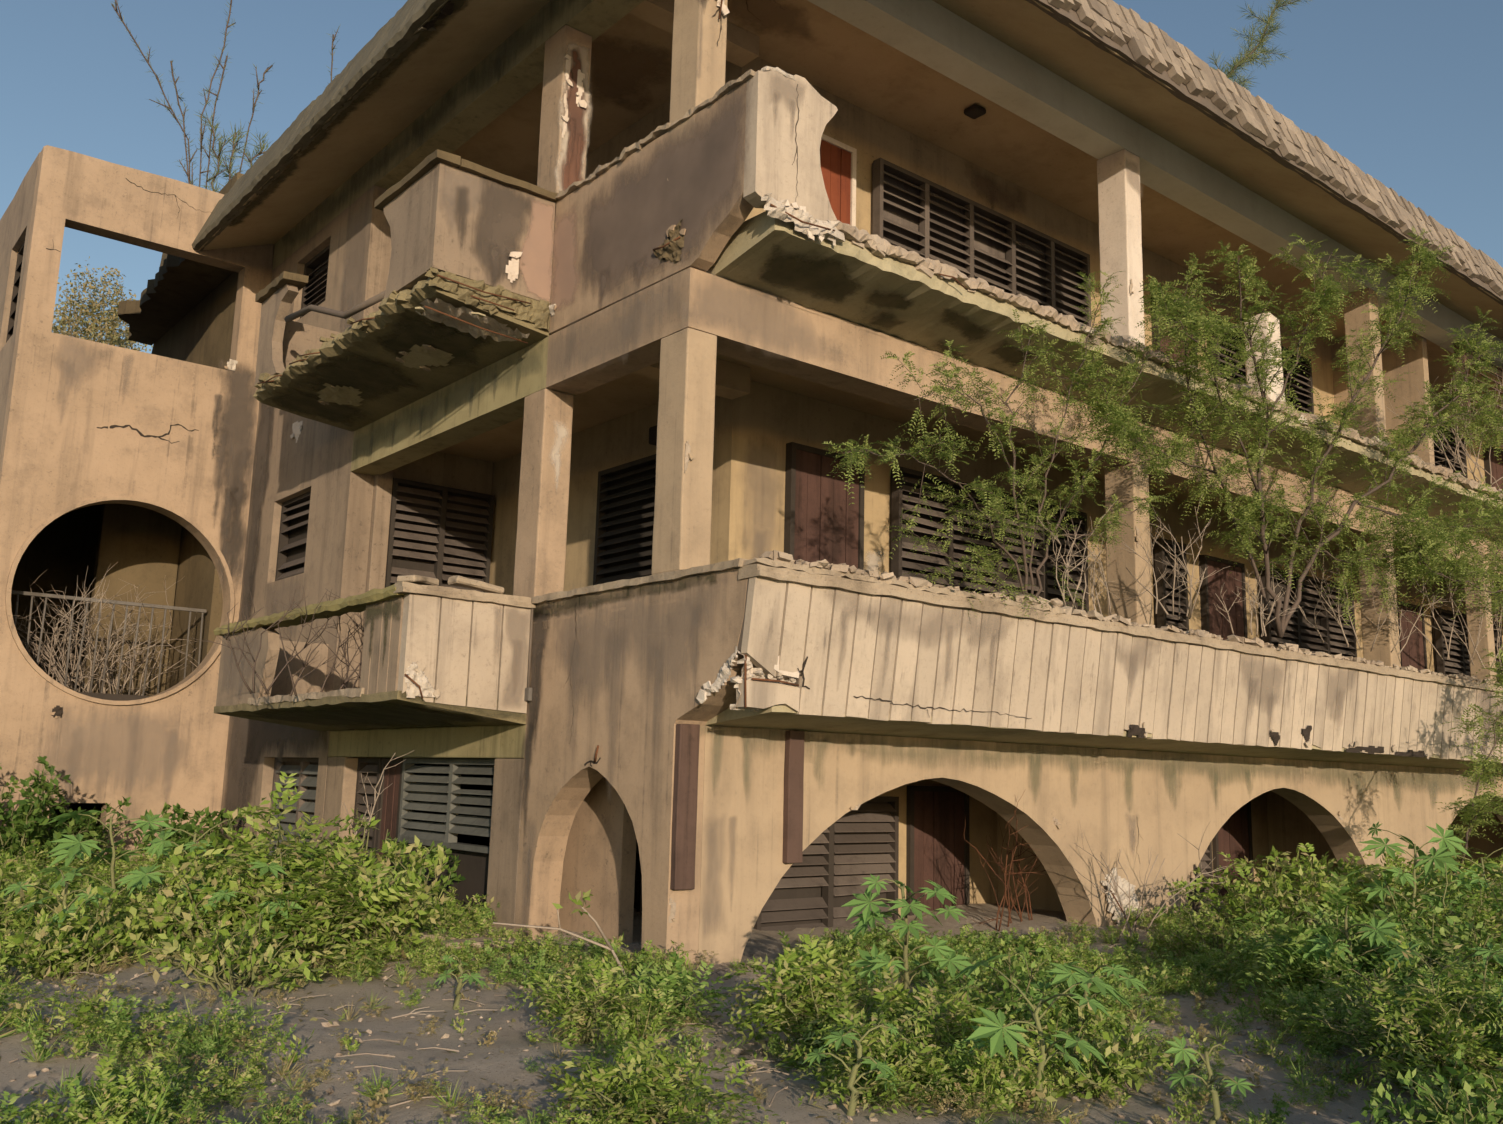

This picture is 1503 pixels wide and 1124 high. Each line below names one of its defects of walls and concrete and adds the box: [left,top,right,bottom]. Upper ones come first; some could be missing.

spalling [717,0,730,19]
crack [126,178,191,218]
spalling [415,44,590,344]
peeling [582,94,745,302]
water stain [760,248,912,329]
peeling [396,344,455,372]
water stain [934,309,1032,366]
spalling [761,193,1503,500]
crack [97,424,199,444]
water stain [213,315,535,622]
spalling [404,661,441,699]
spalling [697,646,800,712]